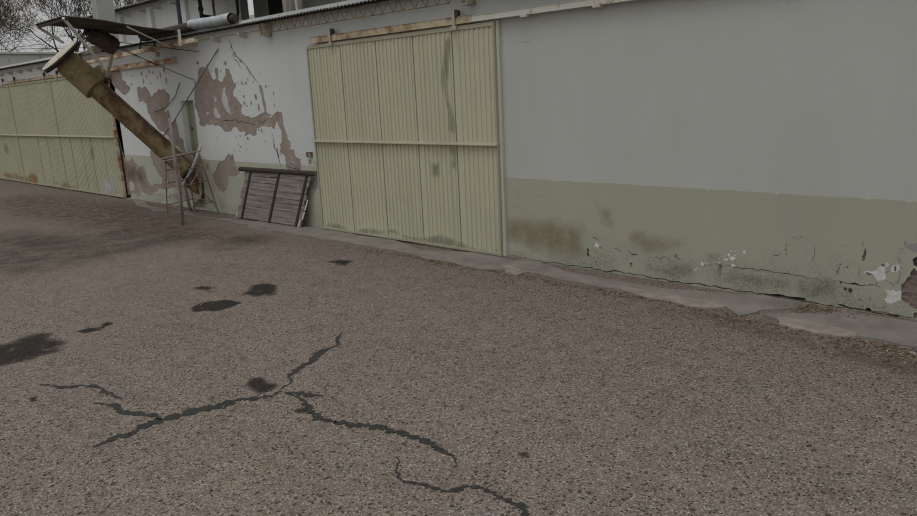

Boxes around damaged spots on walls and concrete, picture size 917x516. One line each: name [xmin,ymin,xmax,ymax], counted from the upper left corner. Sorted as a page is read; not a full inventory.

peeling [111,51,202,202]
peeling [194,52,315,193]
crack [725,252,917,287]
flaking render [836,240,917,320]